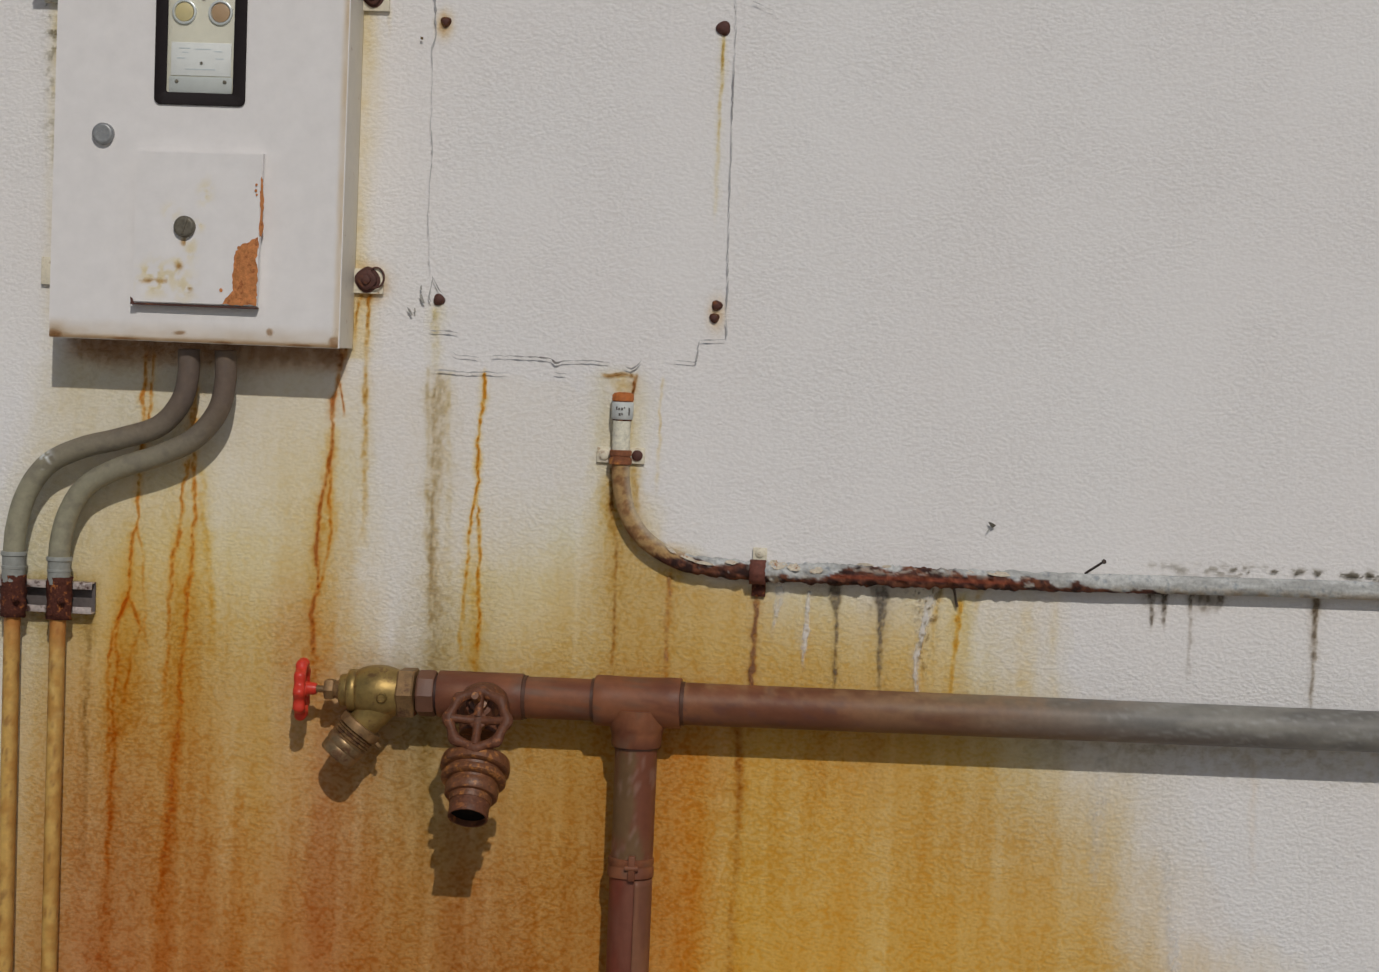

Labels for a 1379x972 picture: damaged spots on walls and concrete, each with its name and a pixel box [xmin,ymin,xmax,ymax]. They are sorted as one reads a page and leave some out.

crack [427,0,642,374]
crack [677,1,772,363]
corrosion [749,609,758,685]
damp [876,587,888,641]
corrosion [58,721,612,972]